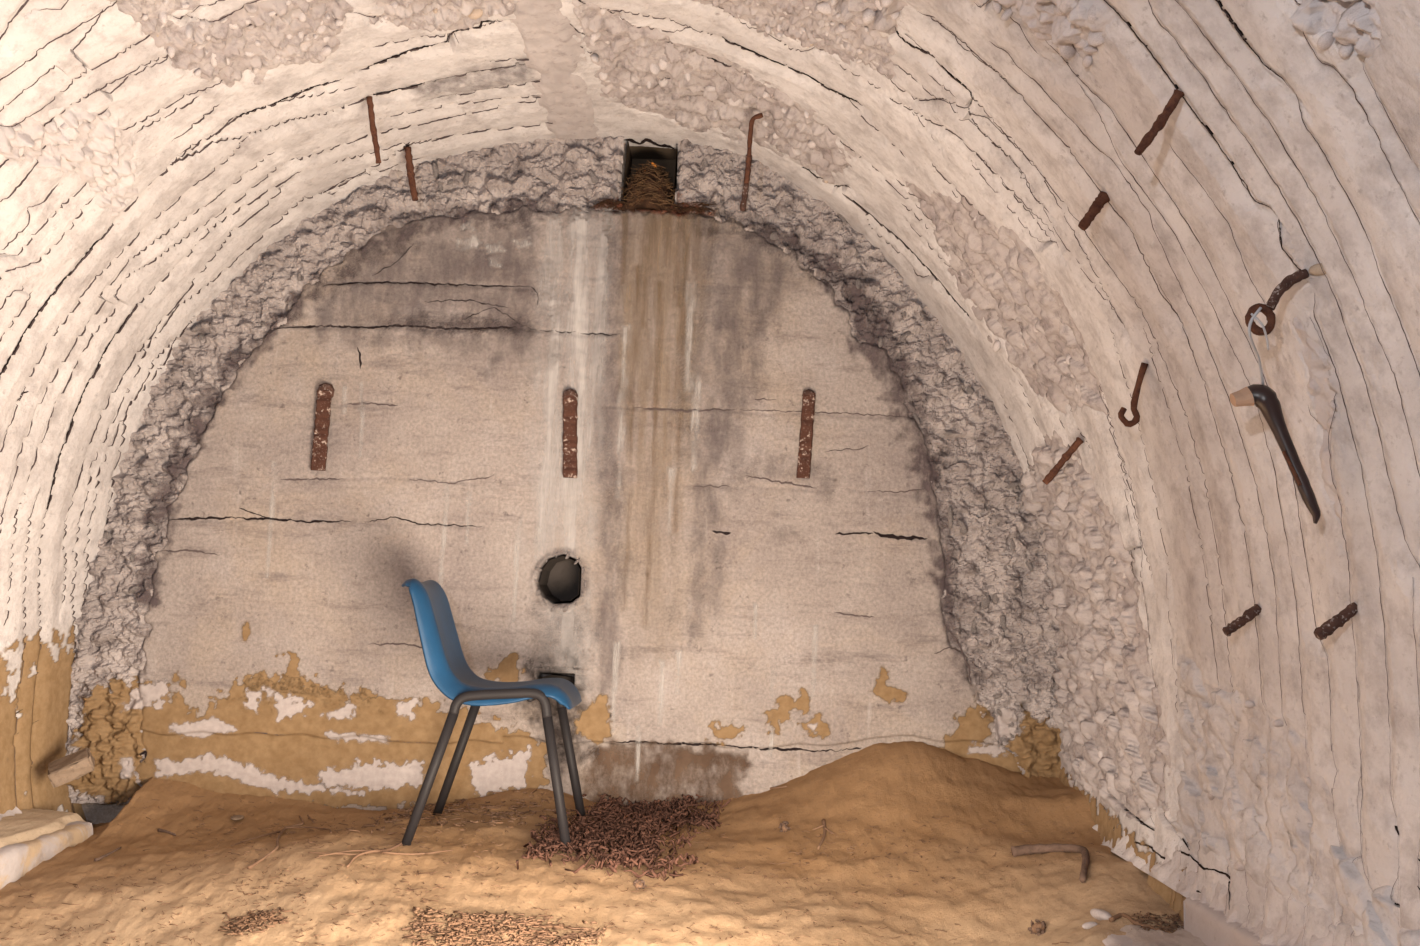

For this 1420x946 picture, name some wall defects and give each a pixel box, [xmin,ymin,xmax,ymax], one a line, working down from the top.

crack [277,245,617,406]
crack [634,398,913,452]
water stain [709,221,957,641]
spalling [63,136,624,810]
crack [694,475,813,488]
crack [868,487,921,495]
crack [837,531,927,541]